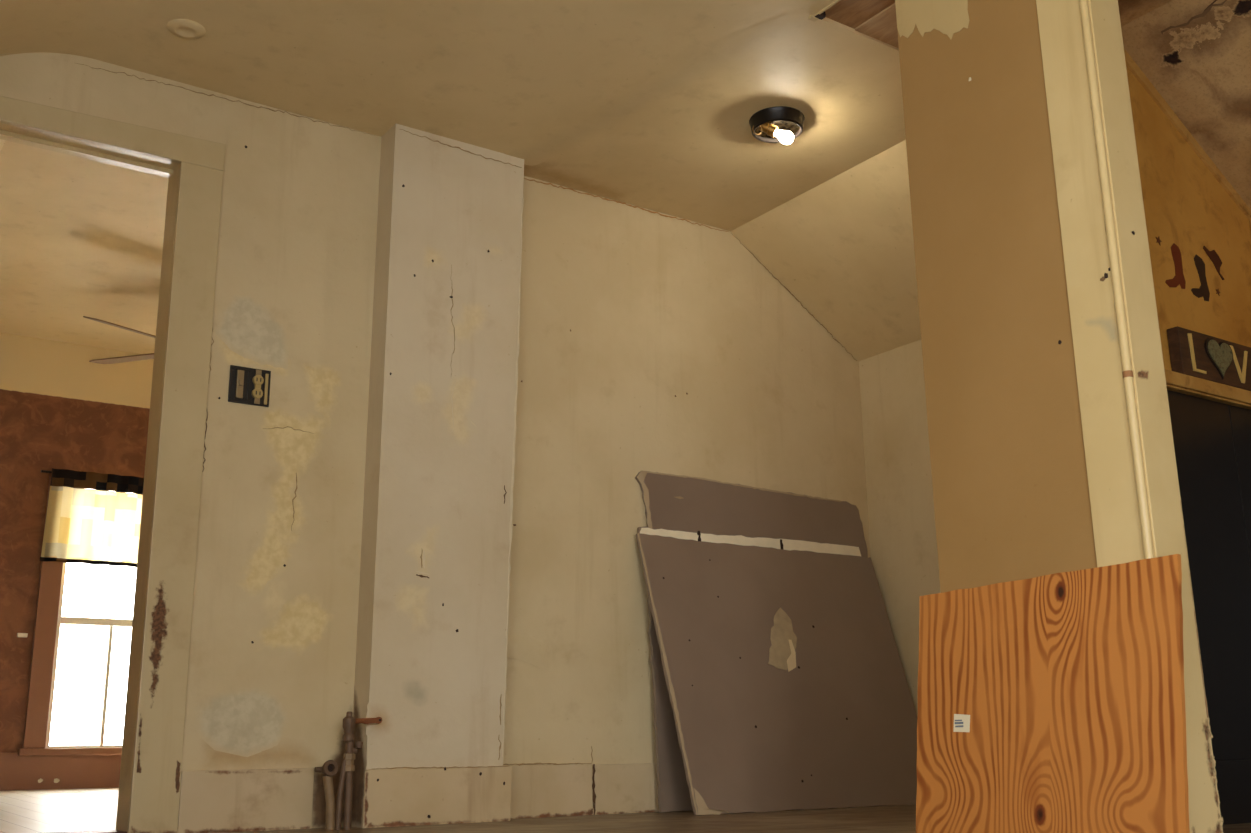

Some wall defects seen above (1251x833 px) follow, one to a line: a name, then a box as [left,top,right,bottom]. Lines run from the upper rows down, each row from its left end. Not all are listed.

peeling [895,0,970,39]
water stain [1118,0,1251,87]
peeling [1159,0,1251,69]
water stain [1174,83,1251,190]
peeling [1180,499,1223,833]